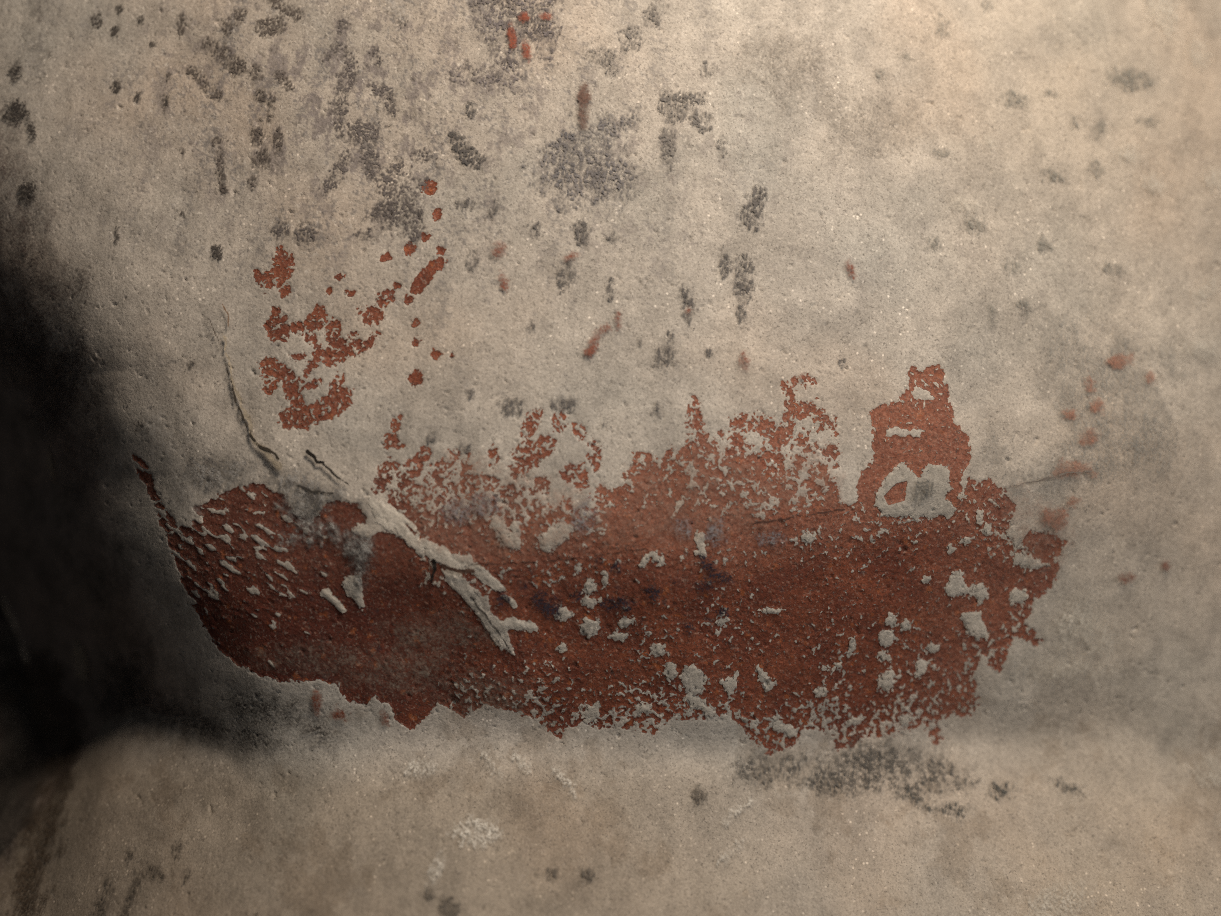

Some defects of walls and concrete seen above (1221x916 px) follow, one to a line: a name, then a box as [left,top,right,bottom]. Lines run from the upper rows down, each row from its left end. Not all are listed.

damp [450,0,563,93]
damp [202,0,304,194]
damp [319,10,438,245]
damp [448,129,487,169]
damp [522,105,638,245]
damp [657,89,727,169]
damp [737,185,768,232]
damp [719,245,755,322]
peeling [584,312,621,356]
crack [208,303,349,494]
peeling [132,364,1078,756]
damp [732,736,1008,816]